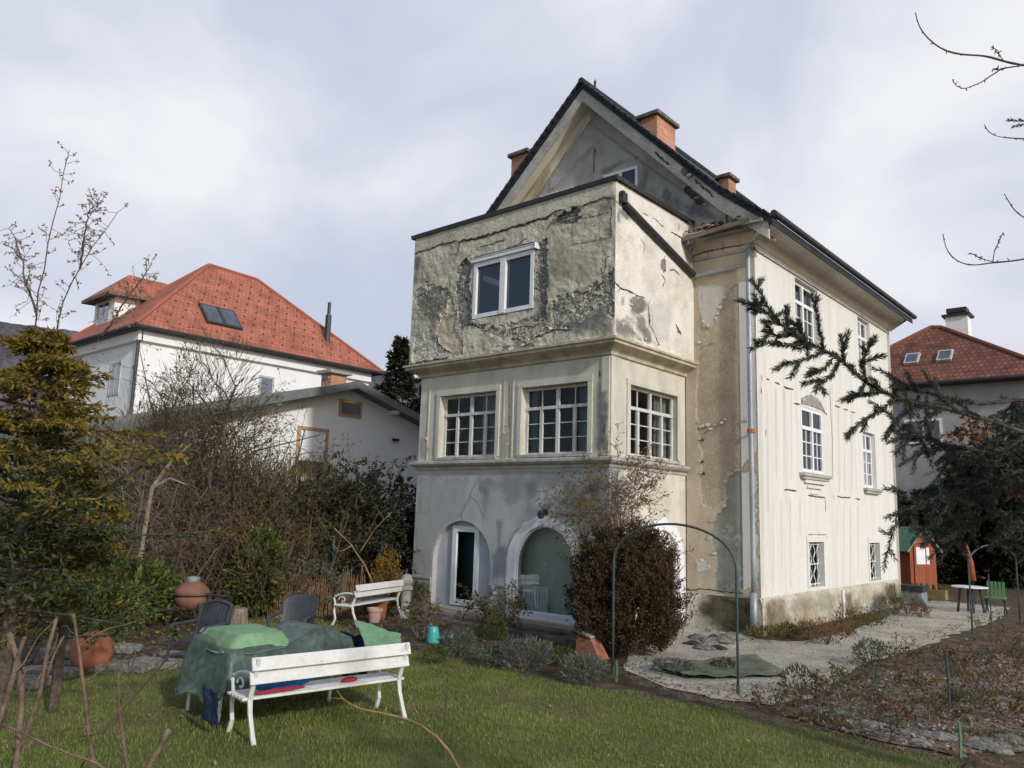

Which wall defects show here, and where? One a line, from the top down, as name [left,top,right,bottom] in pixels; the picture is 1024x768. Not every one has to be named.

flaking render [411,207,670,363]
crack [415,122,751,347]
flaking render [695,277,761,592]